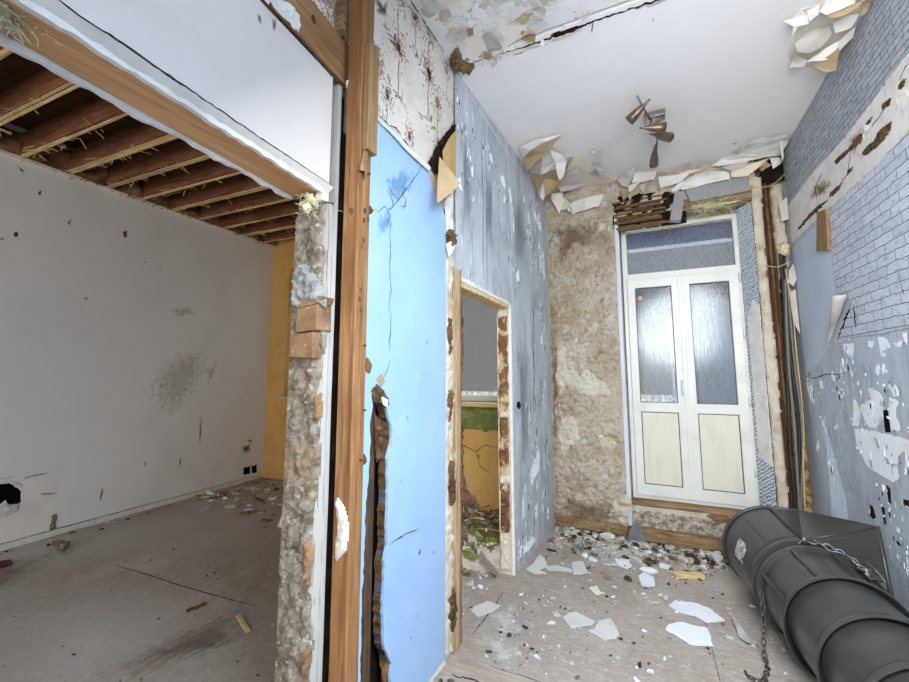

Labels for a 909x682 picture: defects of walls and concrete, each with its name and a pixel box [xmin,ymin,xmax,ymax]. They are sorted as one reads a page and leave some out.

spalling [0,0,334,682]
crack [374,116,422,386]
flaking render [420,0,909,682]
spalling [360,374,390,682]
crack [452,659,541,682]